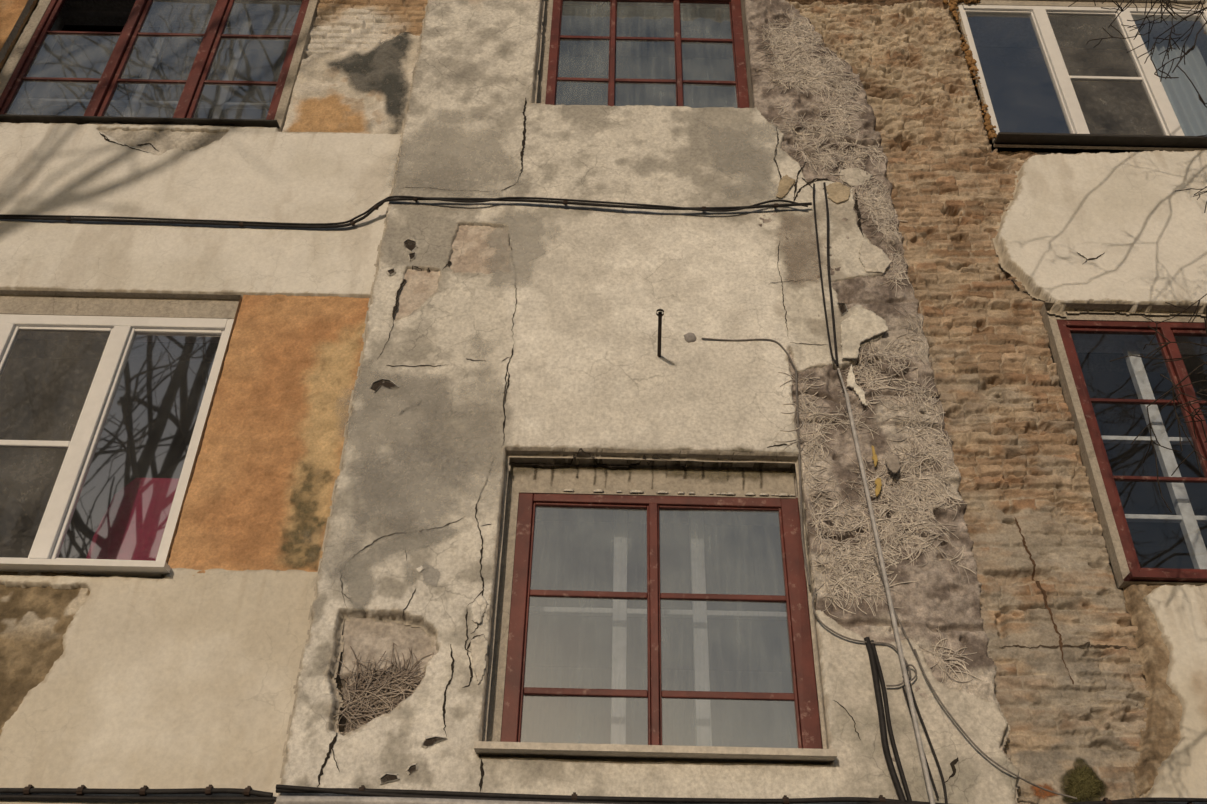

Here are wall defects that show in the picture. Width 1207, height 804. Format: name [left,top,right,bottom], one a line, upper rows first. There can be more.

spalling [304,0,428,59]
crack [404,98,527,192]
spalling [448,225,511,274]
spalling [740,0,1183,804]
crack [340,236,684,736]
spalling [0,571,94,735]
spalling [333,617,438,735]
crack [317,733,340,787]
crack [477,759,485,791]